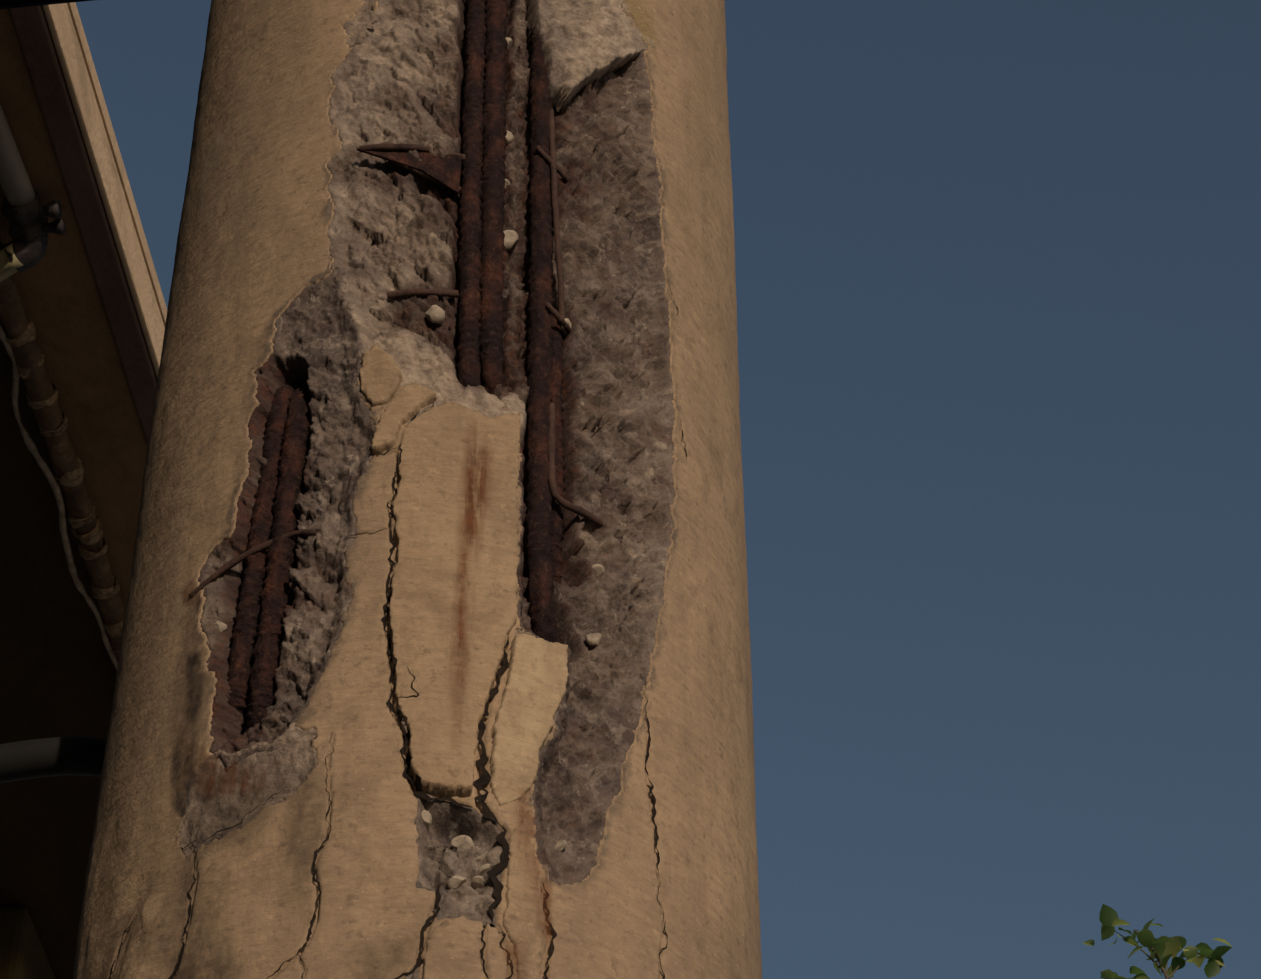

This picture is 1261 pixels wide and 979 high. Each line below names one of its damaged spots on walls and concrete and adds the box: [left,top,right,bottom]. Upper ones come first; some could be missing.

spalling [175,0,680,886]
crack [349,397,513,979]
crack [108,906,140,979]
crack [168,788,285,979]
crack [266,732,334,979]
spalling [413,792,508,926]
crack [543,883,557,979]
crack [643,670,668,979]